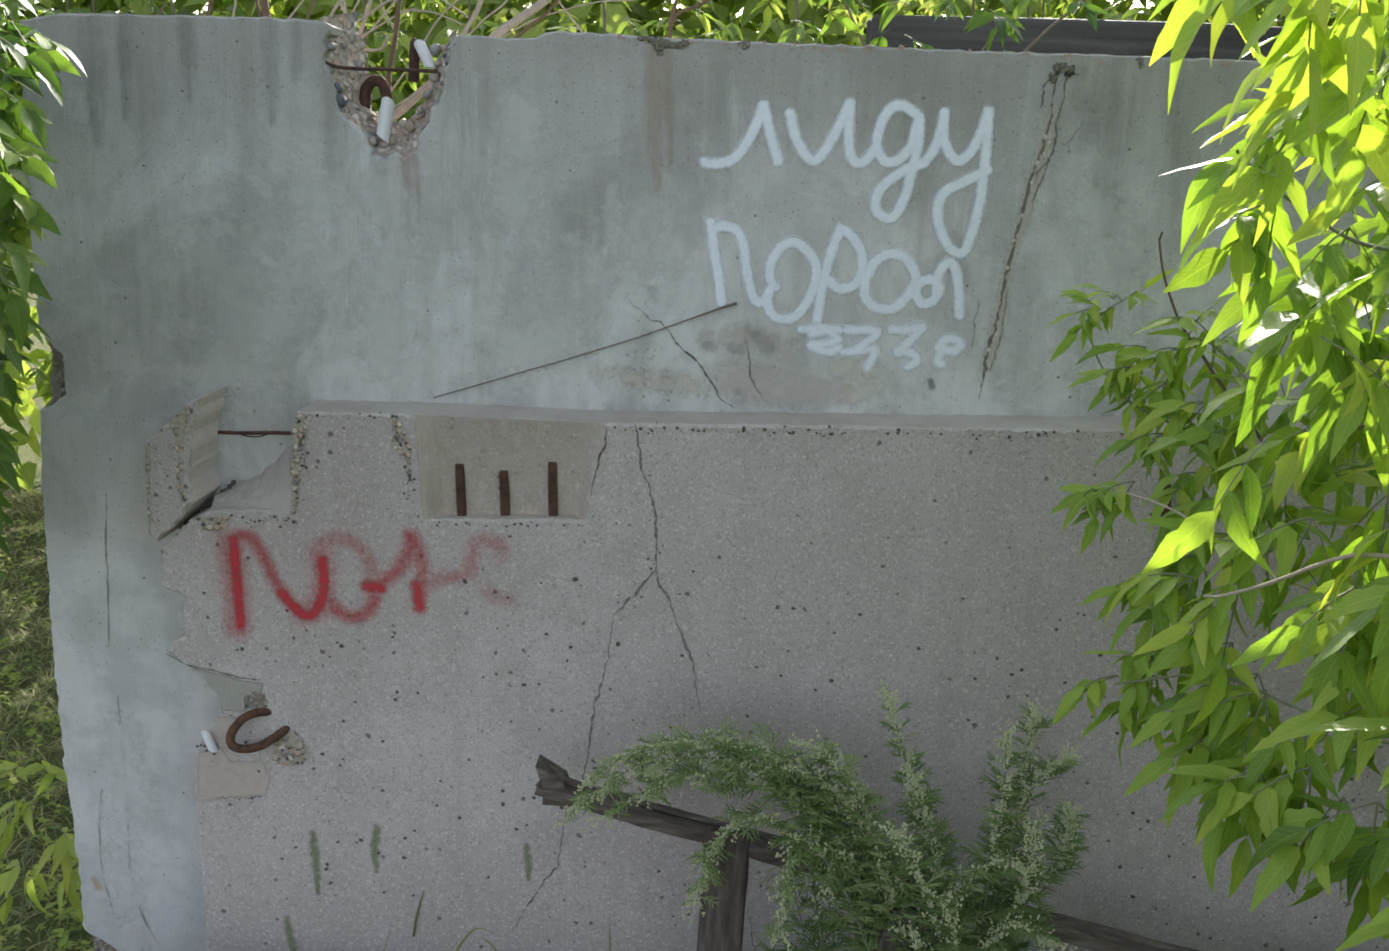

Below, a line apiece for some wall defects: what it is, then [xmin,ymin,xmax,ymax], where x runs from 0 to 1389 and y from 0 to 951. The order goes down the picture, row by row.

spalling [320,11,458,159]
crack [971,72,1082,396]
crack [630,301,764,407]
spalling [169,404,194,503]
spalling [187,412,419,532]
crack [582,426,699,780]
peeling [166,653,324,828]
crack [512,808,567,931]